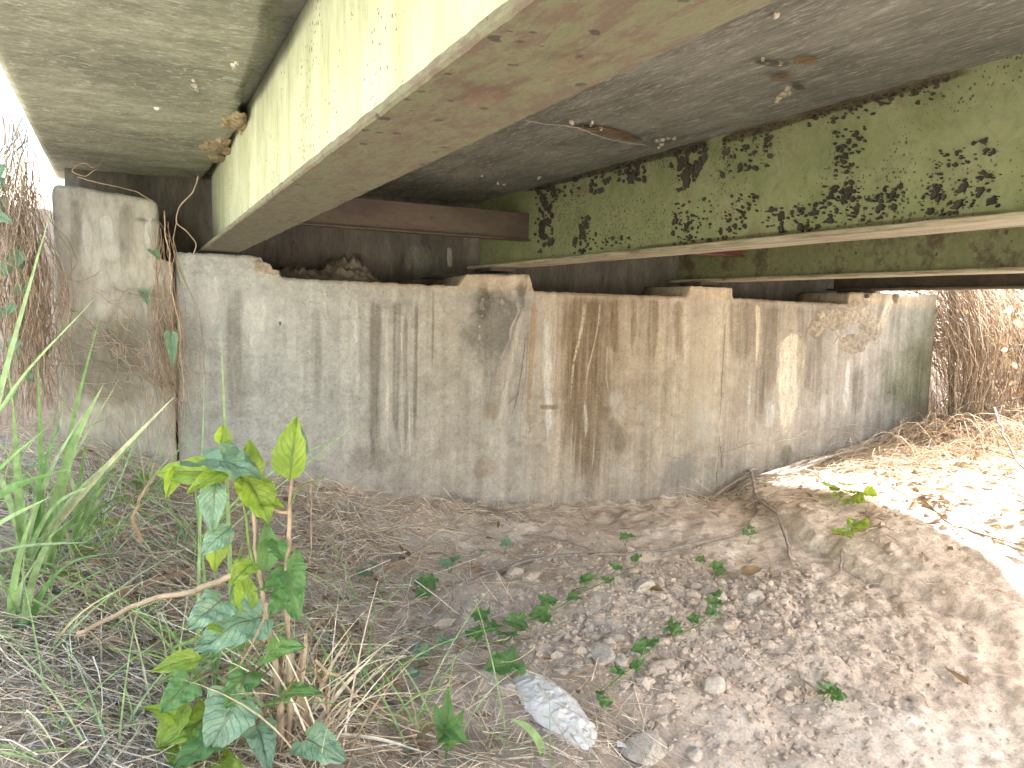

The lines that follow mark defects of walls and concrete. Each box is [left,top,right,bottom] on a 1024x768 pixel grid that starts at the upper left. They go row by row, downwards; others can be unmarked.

crack [526,120,643,145]
peeling [669,80,948,246]
peeling [920,137,1002,216]
spalling [807,298,884,354]
leakage [544,322,552,429]
leakage [563,301,603,466]
leakage [777,333,805,430]